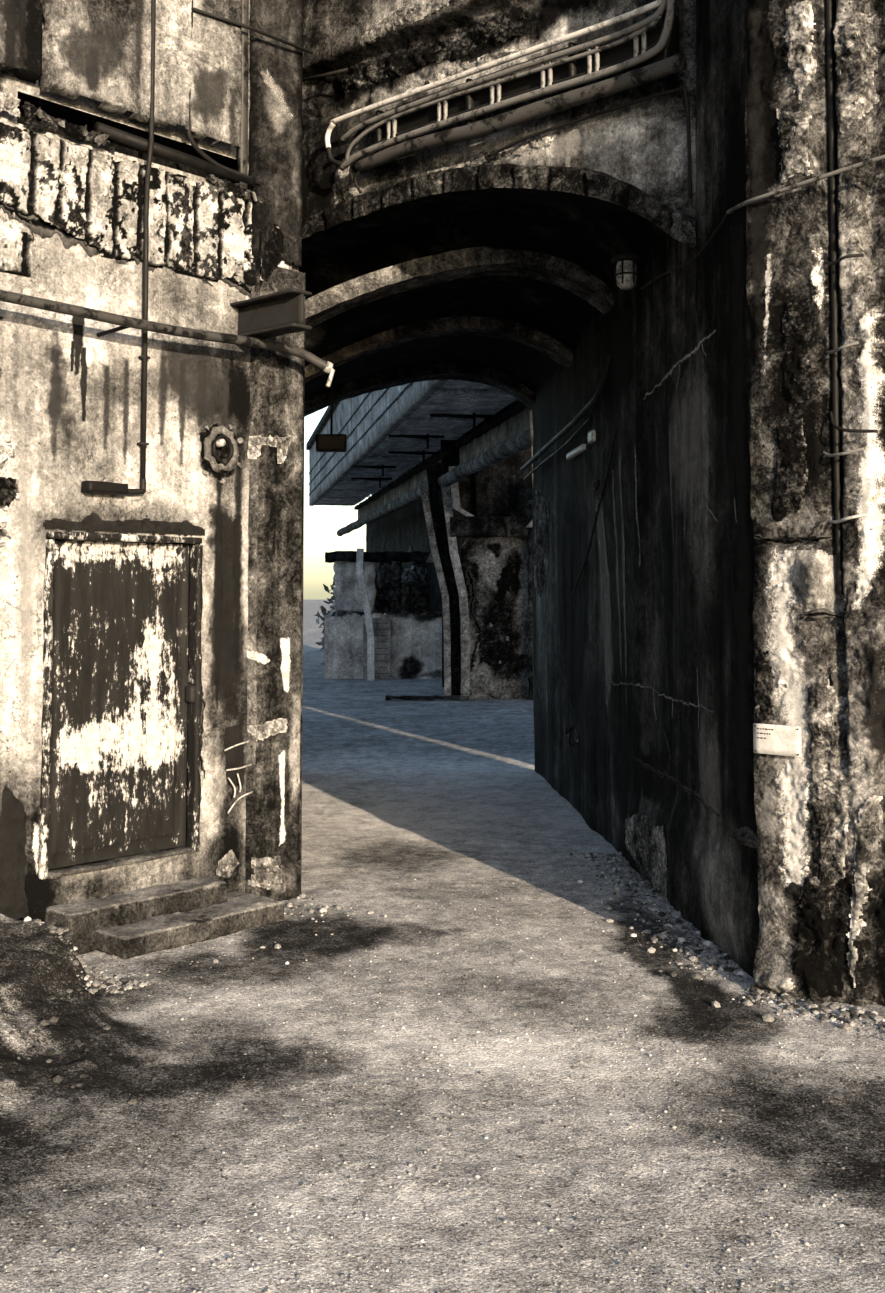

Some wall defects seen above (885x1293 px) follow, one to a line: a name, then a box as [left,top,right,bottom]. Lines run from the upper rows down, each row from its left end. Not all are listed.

peeling [0,213,24,245]
spalling [0,92,115,185]
peeling [55,167,82,203]
peeling [153,202,167,237]
spalling [206,173,264,203]
flaking render [222,221,285,281]
leakage [46,333,75,462]
leakage [103,359,129,458]
crack [603,668,723,820]
leakage [862,643,885,763]